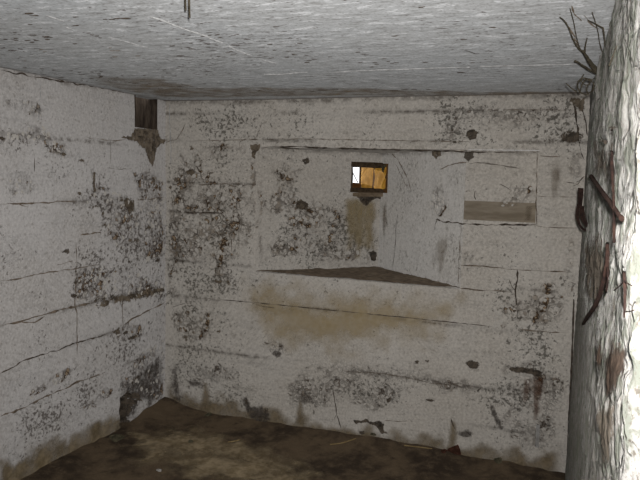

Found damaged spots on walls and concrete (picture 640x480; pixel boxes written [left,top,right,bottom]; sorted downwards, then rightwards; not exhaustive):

spalling [121,128,165,167]
crack [210,123,517,190]
peeling [87,146,255,286]
spalling [260,158,377,264]
crack [435,152,566,305]
crack [1,232,210,373]
spalling [71,267,172,308]
crack [226,300,491,327]
water stain [122,360,159,417]
water stain [171,369,374,437]
water stain [2,419,121,480]
water stain [502,449,554,471]